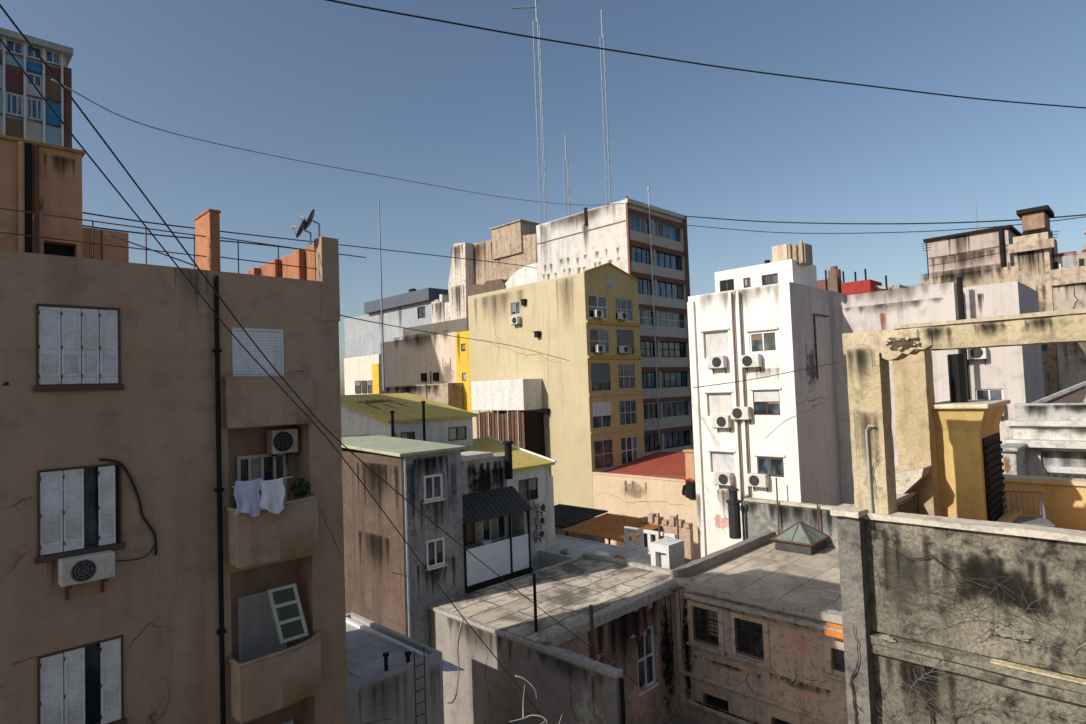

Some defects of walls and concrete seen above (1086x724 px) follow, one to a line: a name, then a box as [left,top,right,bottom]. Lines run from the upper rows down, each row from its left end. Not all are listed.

water stain [923,235,1044,281]
water stain [357,457,454,546]
water stain [468,462,503,493]
water stain [883,533,927,607]
water stain [942,551,1051,619]
water stain [886,657,935,698]